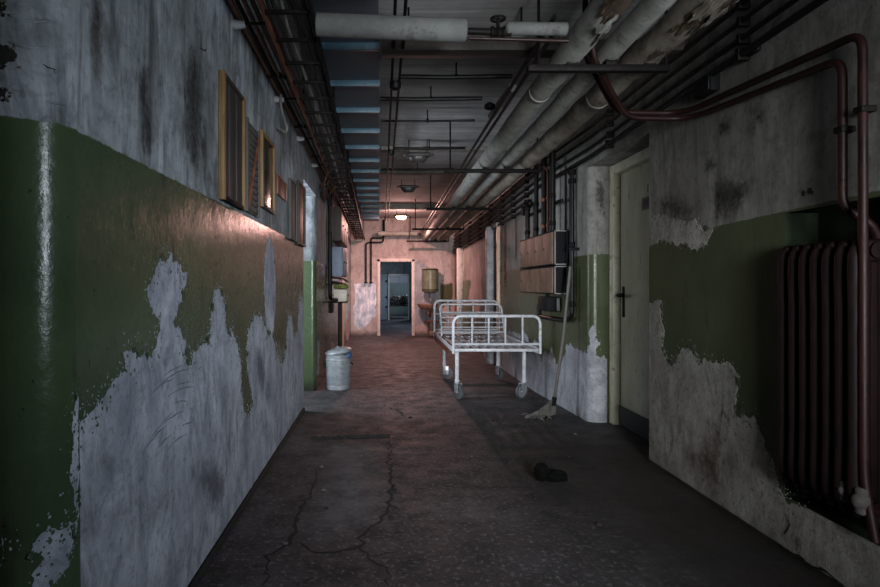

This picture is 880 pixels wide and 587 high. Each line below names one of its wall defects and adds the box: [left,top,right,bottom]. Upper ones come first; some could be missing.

water stain [141,71,150,148]
water stain [184,62,202,160]
peeling [649,203,716,253]
peeling [0,229,304,587]
crack [262,441,400,586]
peeling [468,252,607,423]
peeling [649,300,880,587]